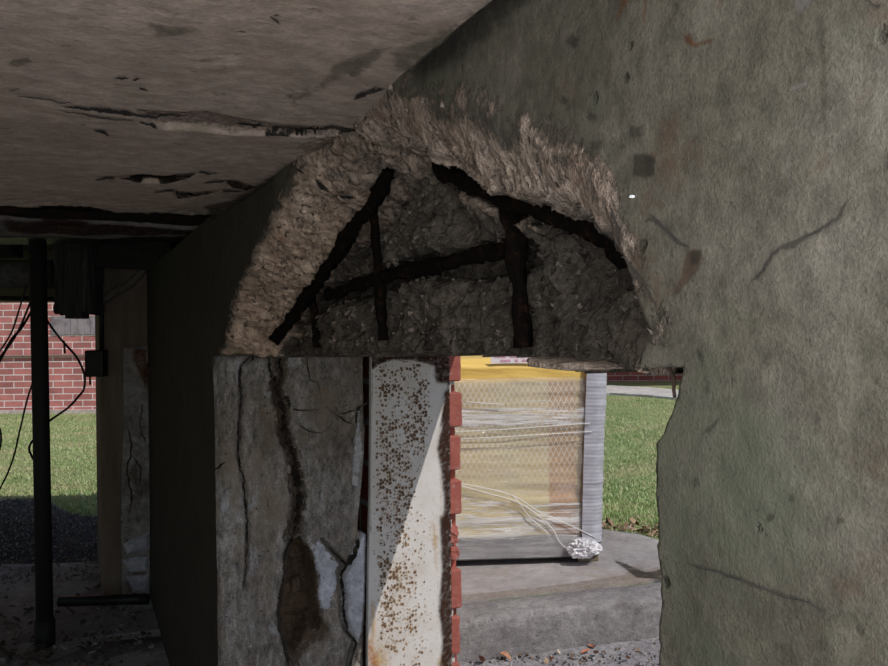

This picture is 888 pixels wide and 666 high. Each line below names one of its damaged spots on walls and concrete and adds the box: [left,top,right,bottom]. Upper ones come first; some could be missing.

crack [18,77,356,139]
spalling [218,84,684,375]
crack [213,356,369,585]
spalling [276,534,338,666]
crack [323,538,360,666]
rust [368,356,452,666]